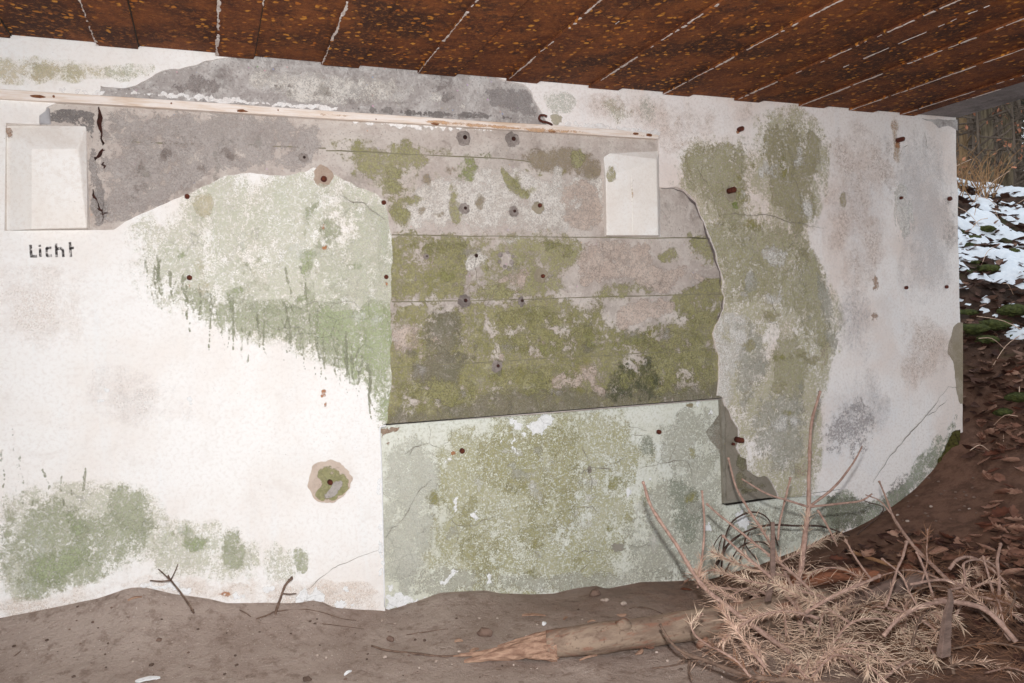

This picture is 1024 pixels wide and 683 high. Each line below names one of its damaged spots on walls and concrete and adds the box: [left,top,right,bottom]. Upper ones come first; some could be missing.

crack [92,107,107,221]
leakage [145,255,265,363]
leakage [282,266,375,419]
flaking render [5,56,777,531]
crack [873,386,957,482]